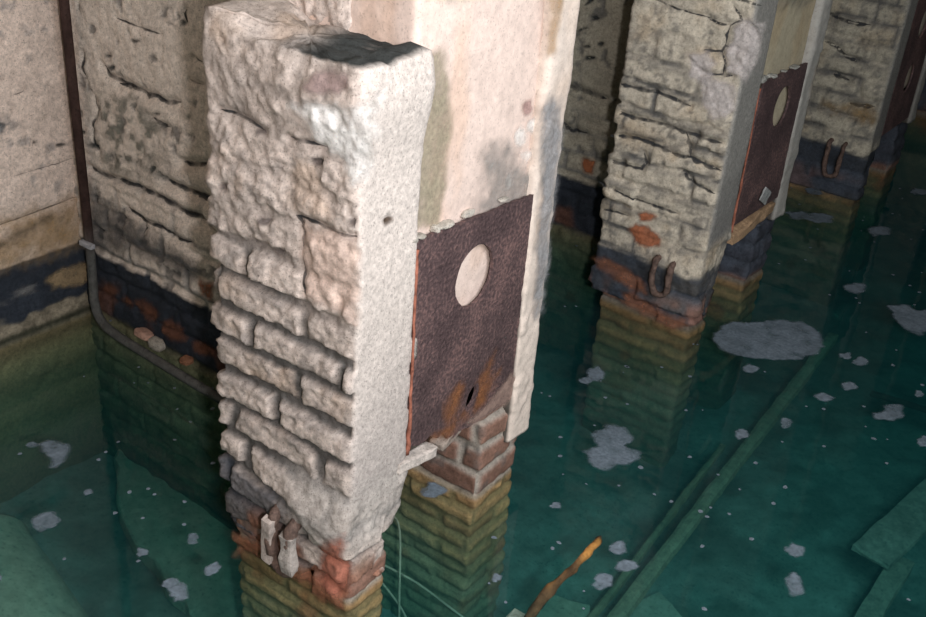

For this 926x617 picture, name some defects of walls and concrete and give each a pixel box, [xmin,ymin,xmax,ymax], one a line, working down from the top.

crack [658,0,762,77]
crack [564,122,588,134]
crack [573,83,722,194]
corrosion [731,88,761,233]
crack [599,182,676,216]
flaking render [597,259,684,328]
corrosion [406,249,420,456]
corrosion [468,375,516,423]
flaking render [292,540,351,609]